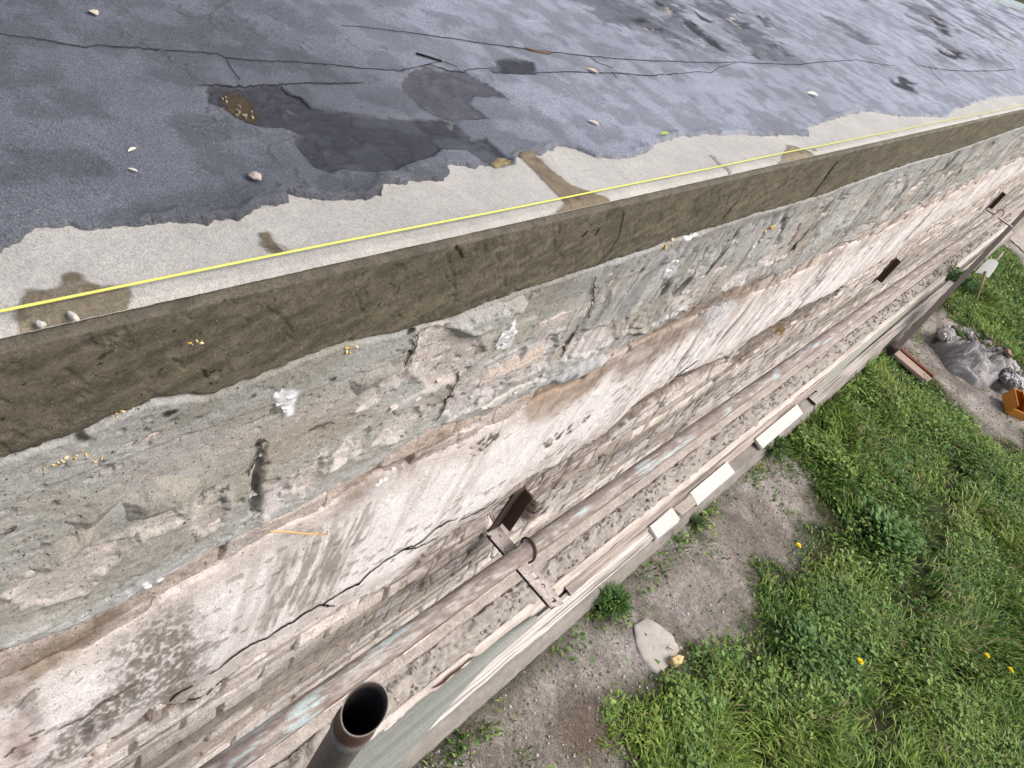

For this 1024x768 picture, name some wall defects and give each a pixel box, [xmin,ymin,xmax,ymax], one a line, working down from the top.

crack [0,25,1014,110]
water stain [522,151,610,213]
water stain [18,273,132,333]
crack [169,499,497,702]